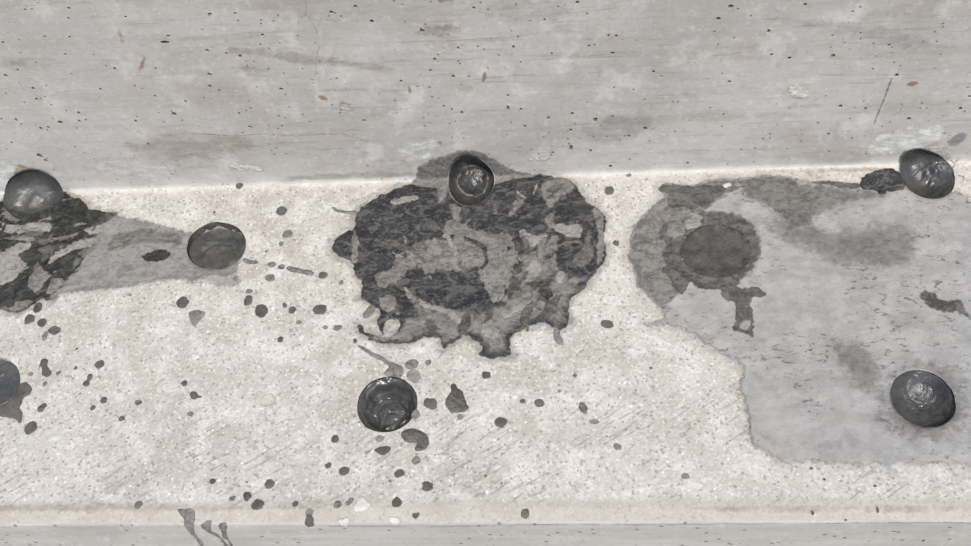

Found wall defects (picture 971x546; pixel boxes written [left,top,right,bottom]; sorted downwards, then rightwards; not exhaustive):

water stain [813,180,861,189]
water stain [109,229,181,250]
water stain [659,185,766,337]
water stain [921,291,969,317]